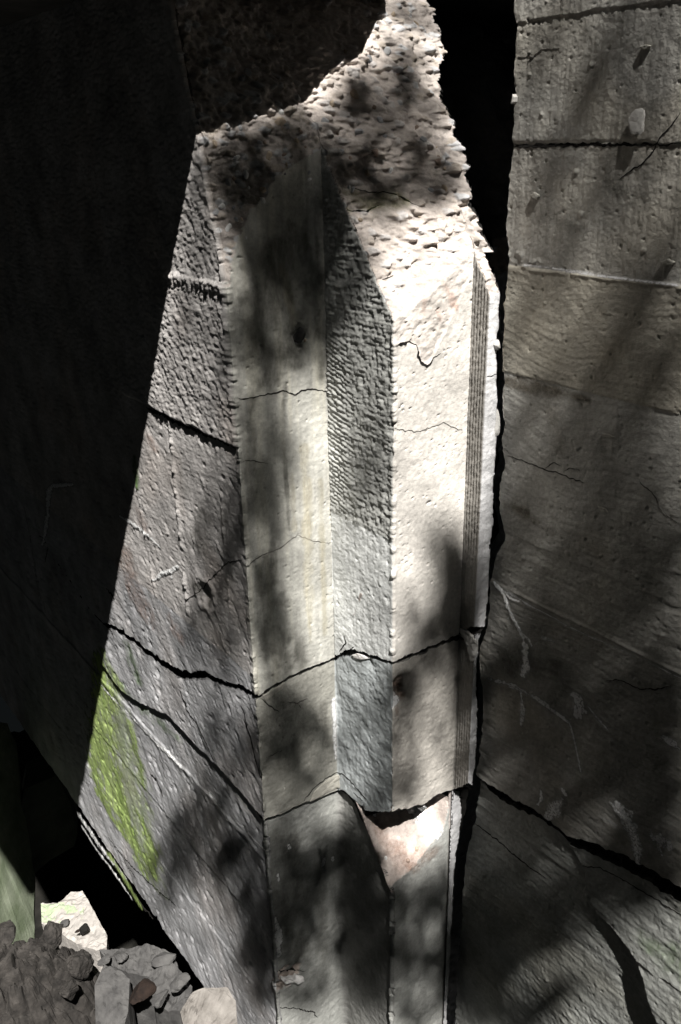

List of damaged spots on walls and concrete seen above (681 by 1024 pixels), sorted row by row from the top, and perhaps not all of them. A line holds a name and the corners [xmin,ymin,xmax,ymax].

crack [514,114,680,178]
crack [146,407,265,463]
crack [239,388,333,400]
crack [396,339,441,368]
crack [487,307,499,387]
crack [489,438,583,549]
damp [99,649,183,785]
crack [107,623,223,761]
damp [86,711,157,881]
crack [304,772,399,823]
damp [77,813,141,907]
crack [445,781,681,1020]